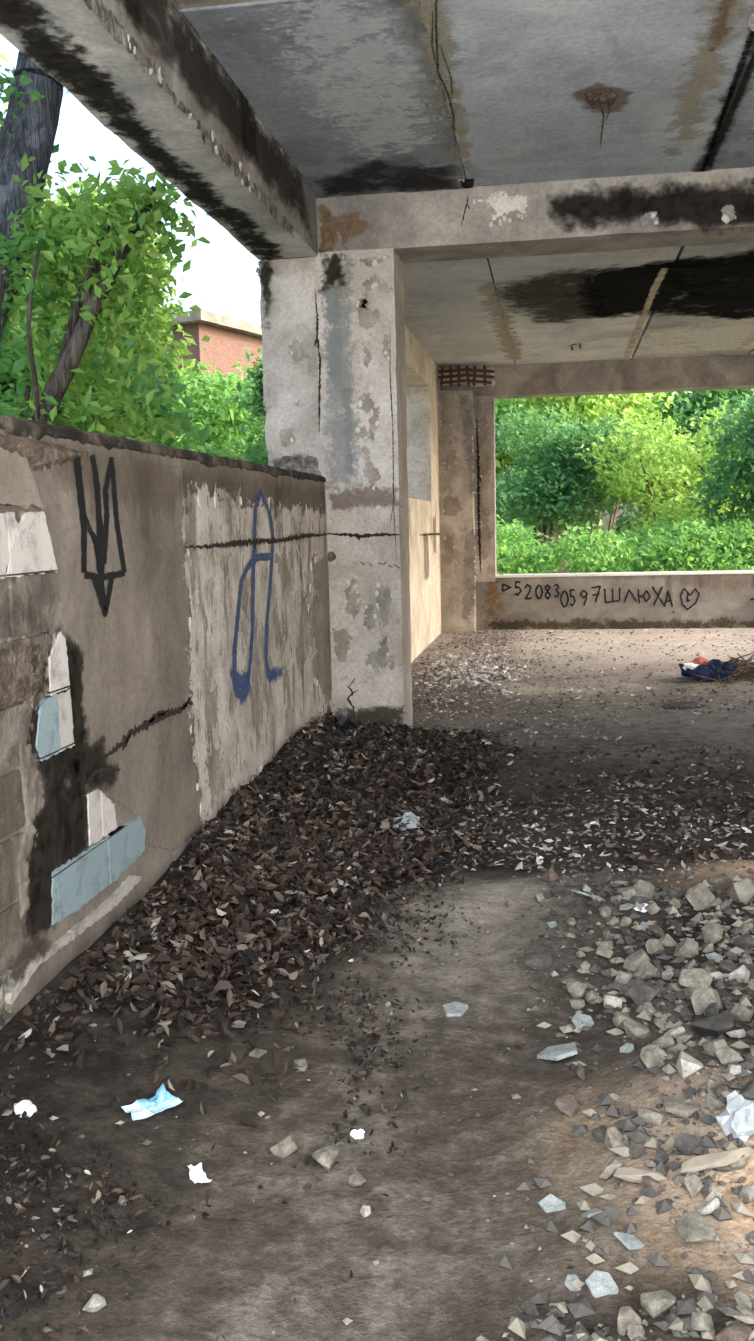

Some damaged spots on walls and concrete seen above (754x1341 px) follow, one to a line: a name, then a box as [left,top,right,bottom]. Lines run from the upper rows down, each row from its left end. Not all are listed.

water stain [126,0,142,23]
spalling [84,0,294,238]
water stain [241,92,258,162]
crack [431,0,455,145]
rust [576,83,634,113]
water stain [320,205,368,490]
water stain [640,318,754,356]
water stain [665,260,754,298]
crack [185,340,440,560]
crack [475,416,483,572]
flaking render [0,629,50,710]
water stain [0,644,89,987]